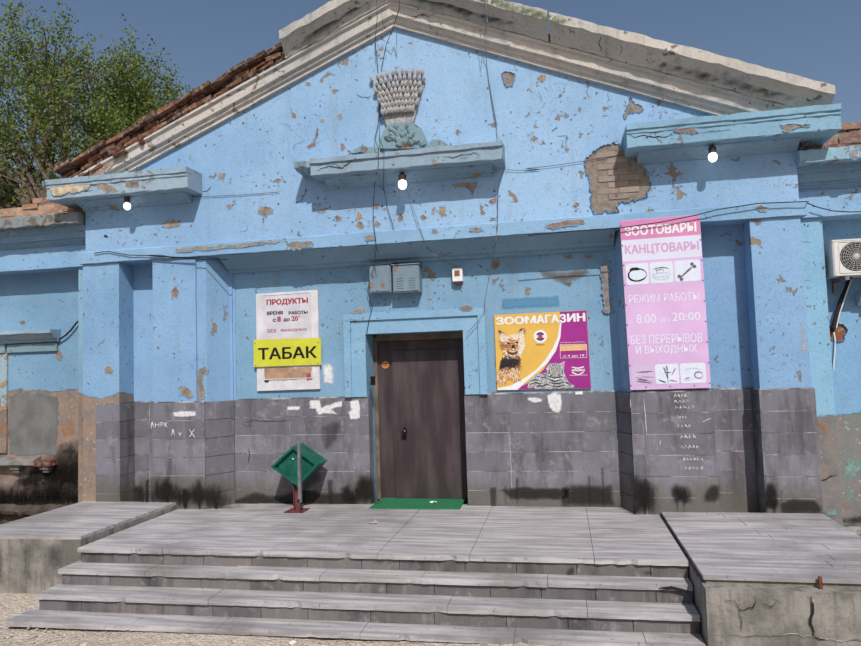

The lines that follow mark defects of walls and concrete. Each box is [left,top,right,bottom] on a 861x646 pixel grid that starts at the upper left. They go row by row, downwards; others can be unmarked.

flaking render [501,71,516,88]
flaking render [623,95,644,120]
spalling [546,141,652,230]
peeling [562,253,612,314]
spalling [829,322,848,342]
water stain [0,424,78,505]
water stain [504,486,613,505]
water stain [706,486,719,500]
water stain [772,500,821,513]
crack [658,585,690,593]
crack [716,596,861,644]